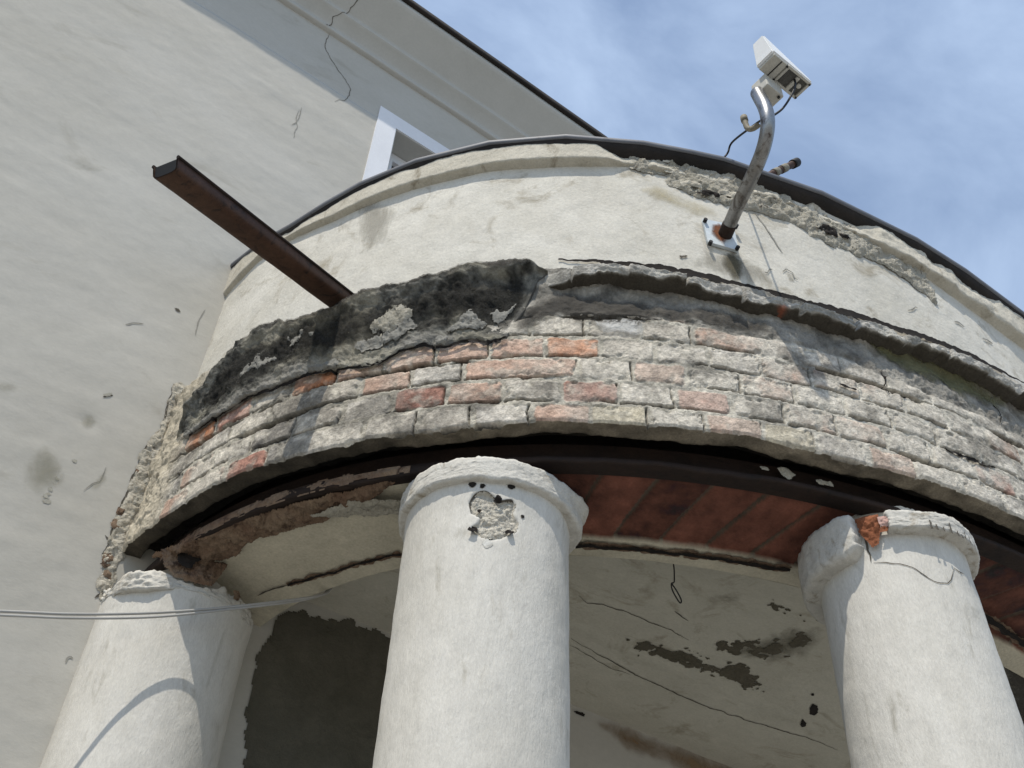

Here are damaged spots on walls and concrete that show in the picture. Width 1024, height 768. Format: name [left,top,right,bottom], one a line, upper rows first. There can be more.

crack [325,0,358,101]
flaking render [629,156,742,206]
flaking render [744,184,937,306]
water stain [203,258,528,408]
flaking render [96,382,185,600]
flaking render [151,481,401,586]
crack [258,551,402,596]
flaking render [468,482,524,540]
crack [864,539,963,584]
peeling [243,609,391,768]
peeling [626,600,817,692]